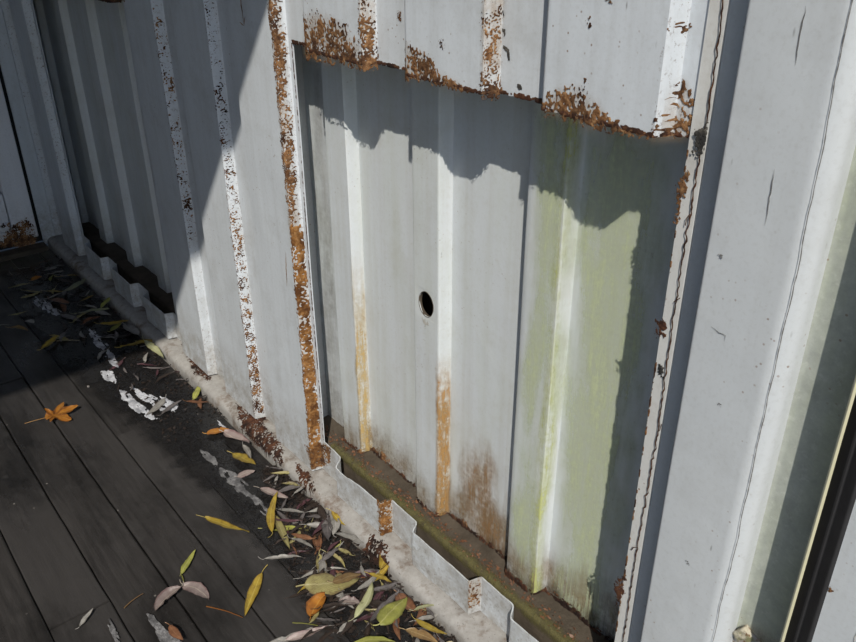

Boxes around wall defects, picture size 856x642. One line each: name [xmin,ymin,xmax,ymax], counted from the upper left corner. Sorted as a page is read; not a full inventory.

corrosion [0,217,38,249]
corrosion [153,8,193,240]
corrosion [187,359,211,381]
leakage [5,263,451,642]
corrosion [204,1,285,466]
corrosion [267,0,695,499]
corrosion [342,381,628,642]
crack [622,153,701,642]
crack [704,0,723,129]
crack [712,0,853,642]